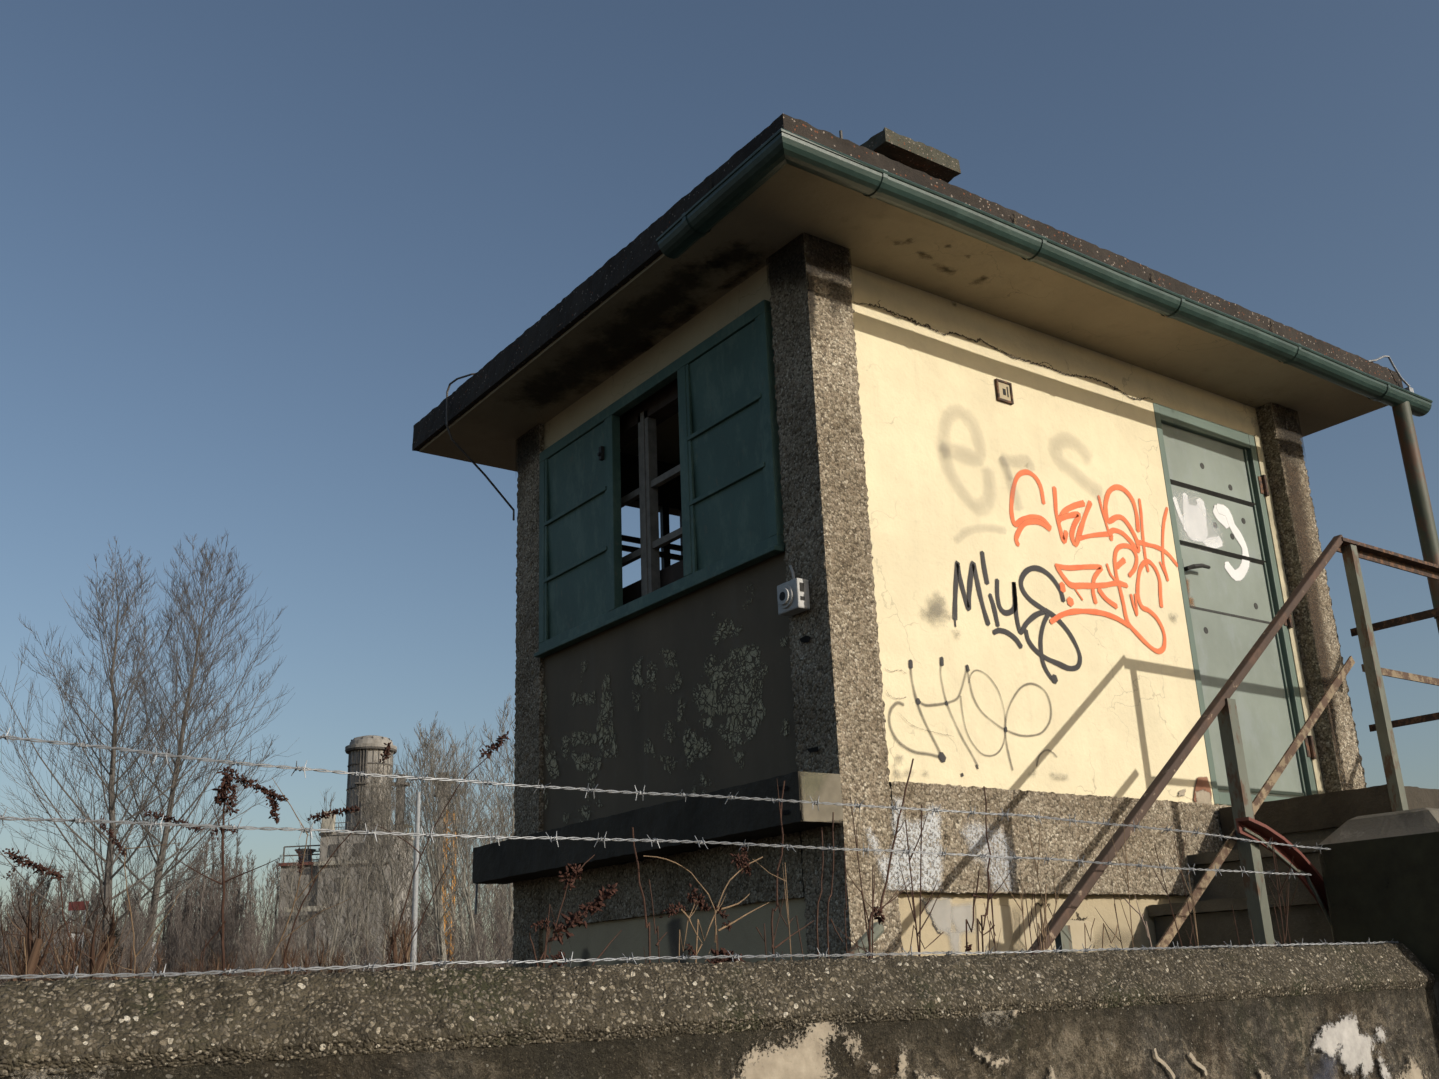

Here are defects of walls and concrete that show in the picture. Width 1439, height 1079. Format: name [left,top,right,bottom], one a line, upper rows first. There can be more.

water stain [523,233,850,404]
crack [854,300,1153,401]
peeling [632,584,768,794]
peeling [543,661,618,824]
peeling [732,1021,944,1079]
peeling [969,1042,1017,1076]
peeling [978,1010,1018,1026]
peeling [1310,1012,1435,1079]